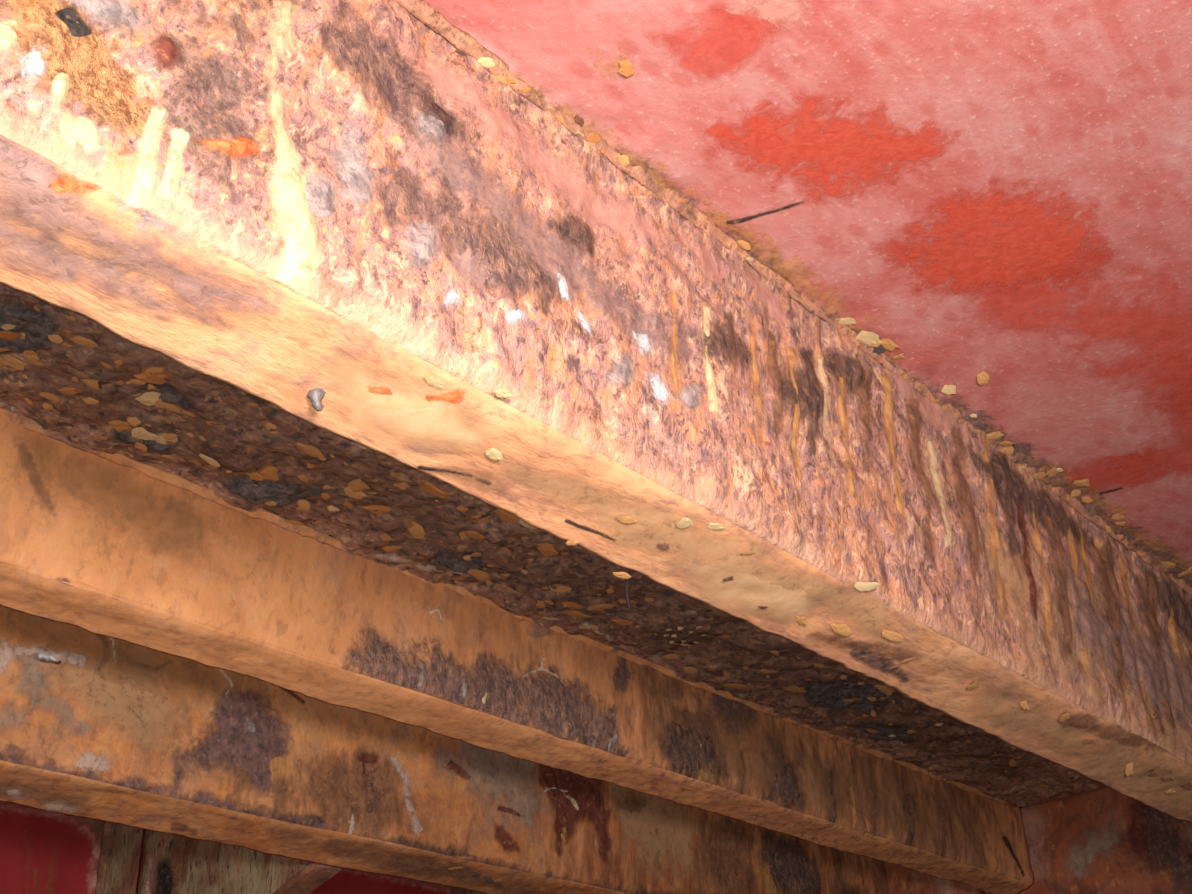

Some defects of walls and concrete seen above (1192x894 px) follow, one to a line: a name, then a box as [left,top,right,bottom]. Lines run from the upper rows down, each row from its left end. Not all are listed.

corrosion [0,135,268,322]
corrosion [454,46,601,143]
corrosion [614,151,698,206]
corrosion [725,232,816,303]
corrosion [750,314,907,519]
corrosion [0,293,779,781]
corrosion [517,470,1017,775]
corrosion [907,379,1192,880]
corrosion [444,741,610,862]
corrosion [765,737,804,809]